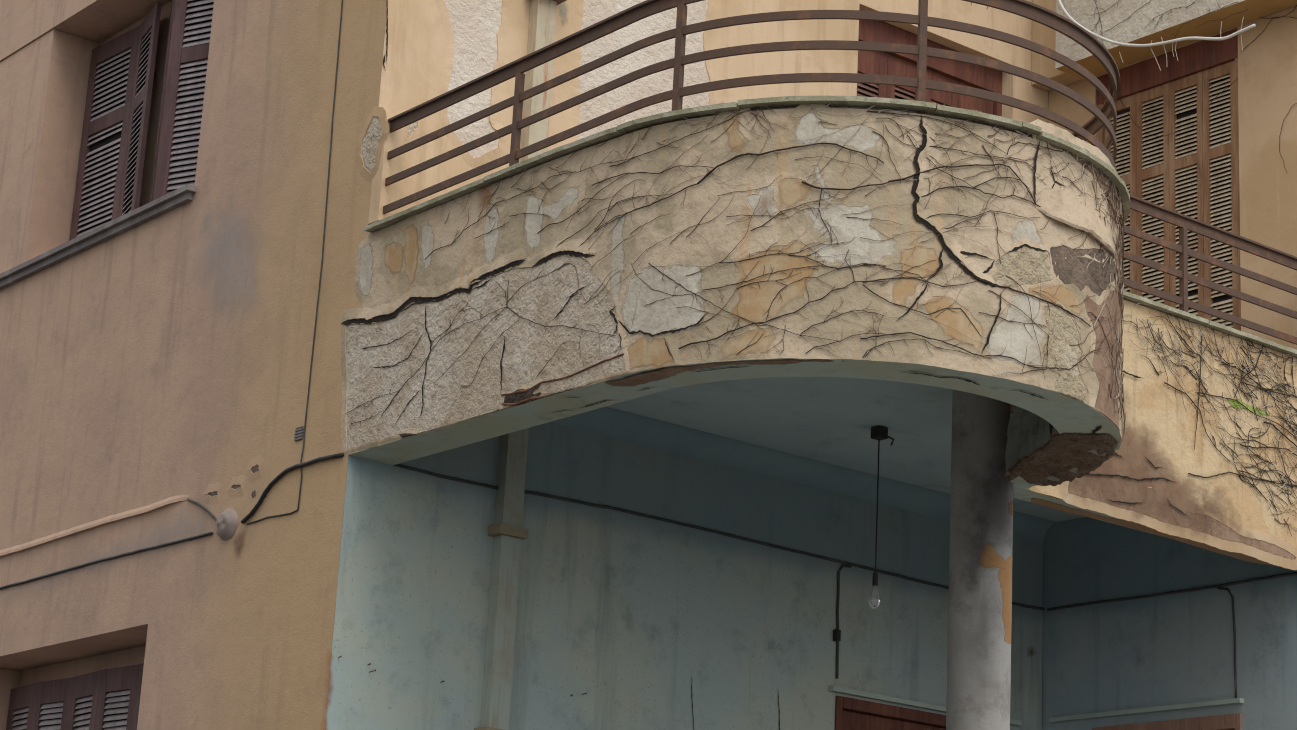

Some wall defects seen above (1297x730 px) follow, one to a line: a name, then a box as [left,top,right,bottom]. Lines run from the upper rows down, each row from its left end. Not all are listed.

flaking render [356,0,513,183]
flaking render [570,0,759,163]
crack [341,238,598,424]
crack [553,387,654,413]
crack [609,306,750,372]
flaking render [340,104,1297,570]
crack [896,117,1050,386]
water stain [1074,420,1224,526]
peeling [978,543,1012,644]